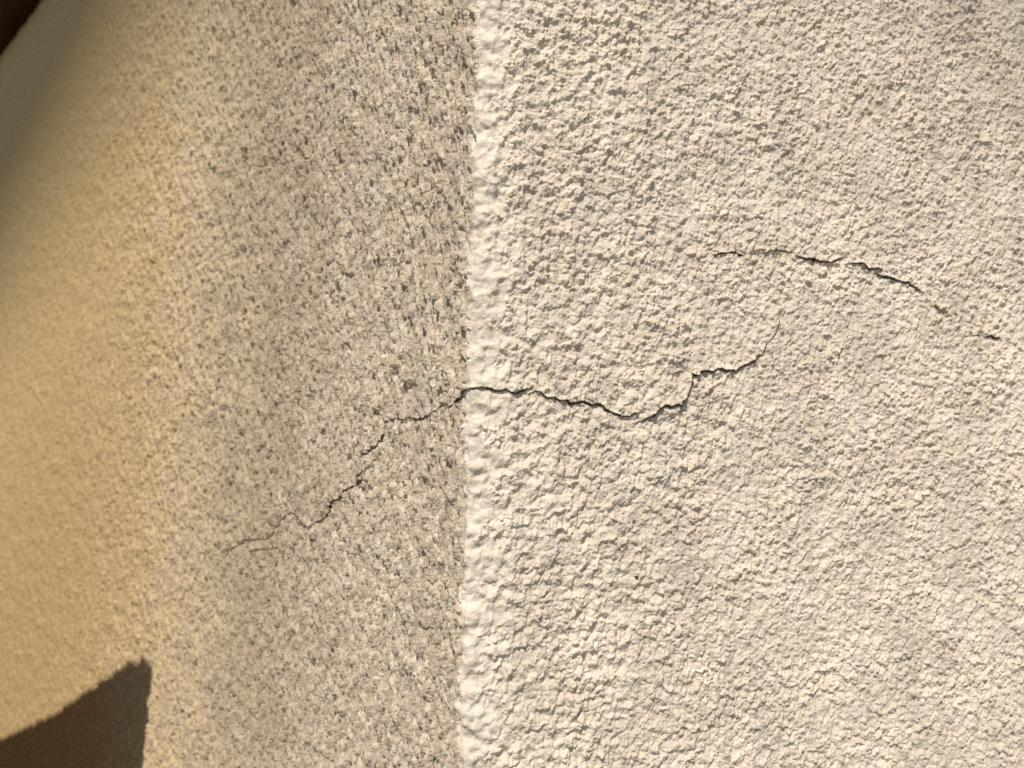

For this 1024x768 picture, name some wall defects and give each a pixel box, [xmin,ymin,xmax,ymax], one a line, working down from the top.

crack [707,248,959,315]
crack [975,331,1001,339]
crack [223,317,780,552]